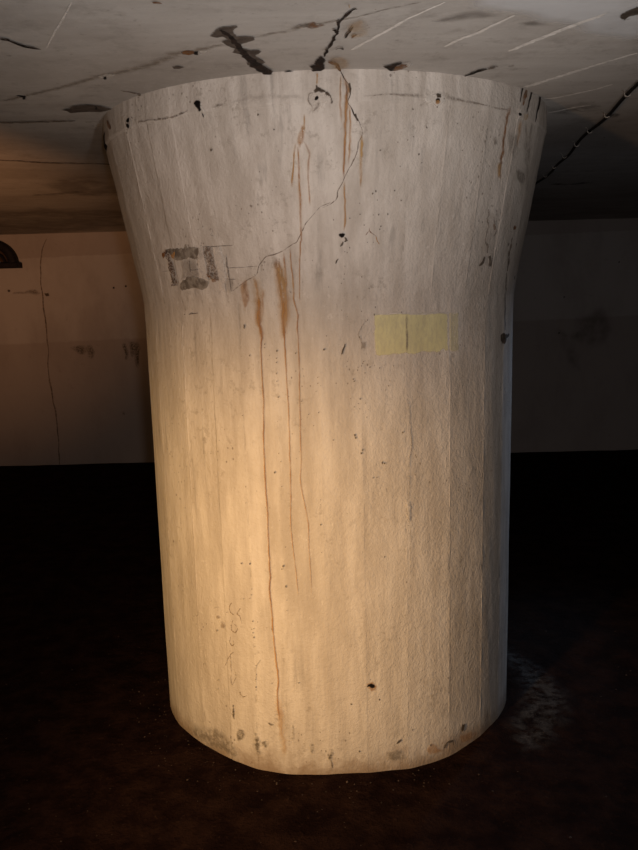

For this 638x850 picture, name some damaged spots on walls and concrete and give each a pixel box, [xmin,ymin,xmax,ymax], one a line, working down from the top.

crack [211,26,273,75]
rust [291,117,310,217]
crack [233,6,376,291]
rust [343,84,351,173]
crack [40,239,60,464]
spalling [162,244,225,290]
rust [275,232,302,365]
rust [261,354,279,715]